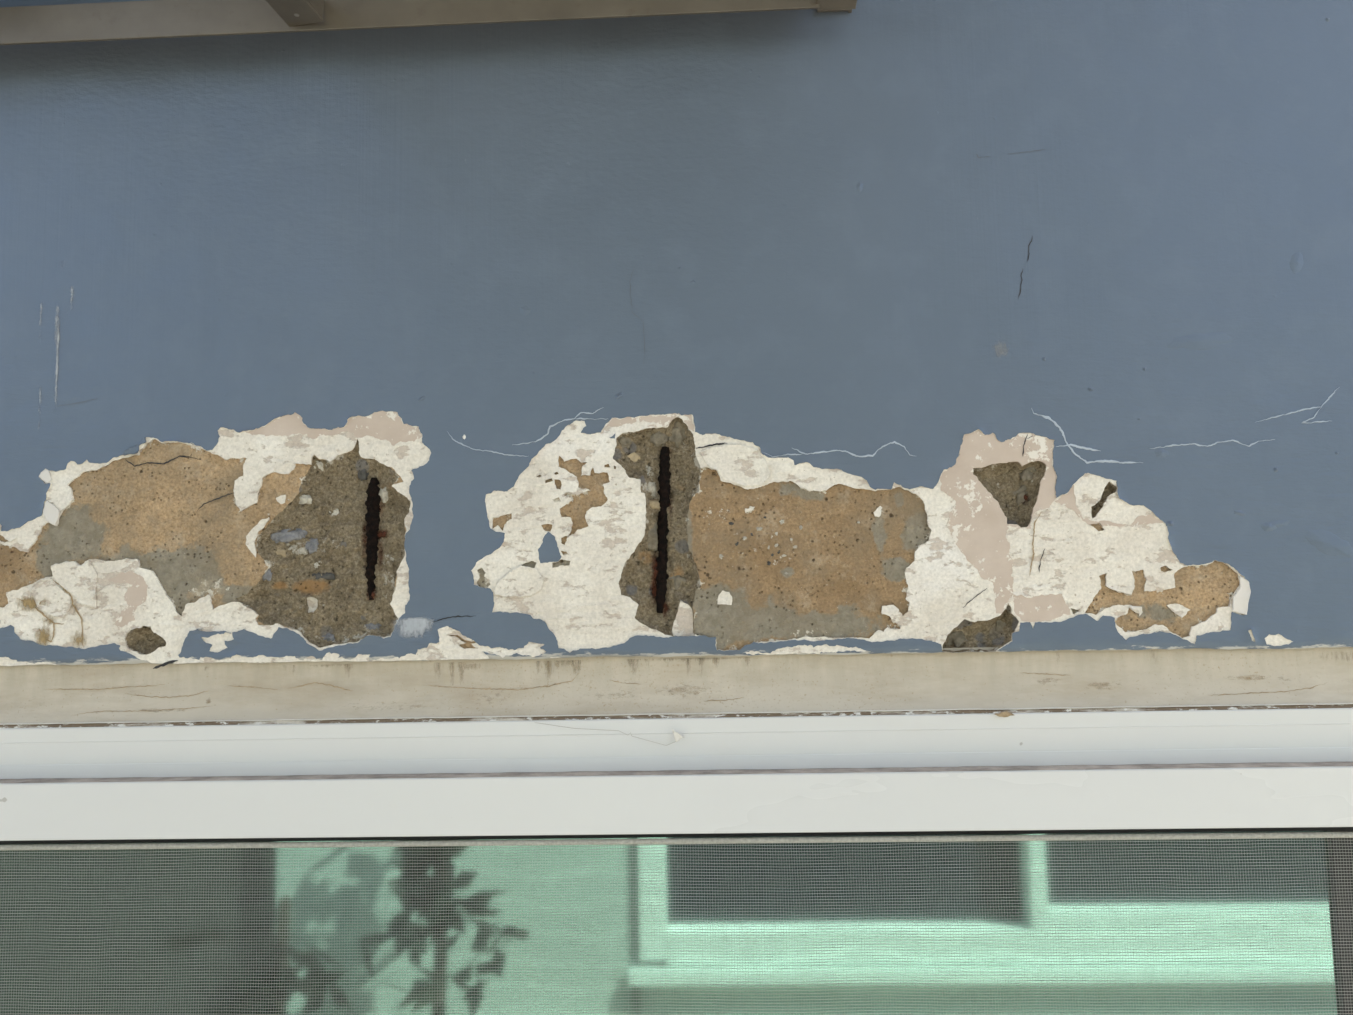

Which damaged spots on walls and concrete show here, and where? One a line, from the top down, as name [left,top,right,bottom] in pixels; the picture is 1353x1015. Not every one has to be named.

peeling [0,657,58,666]
peeling [0,411,1293,664]